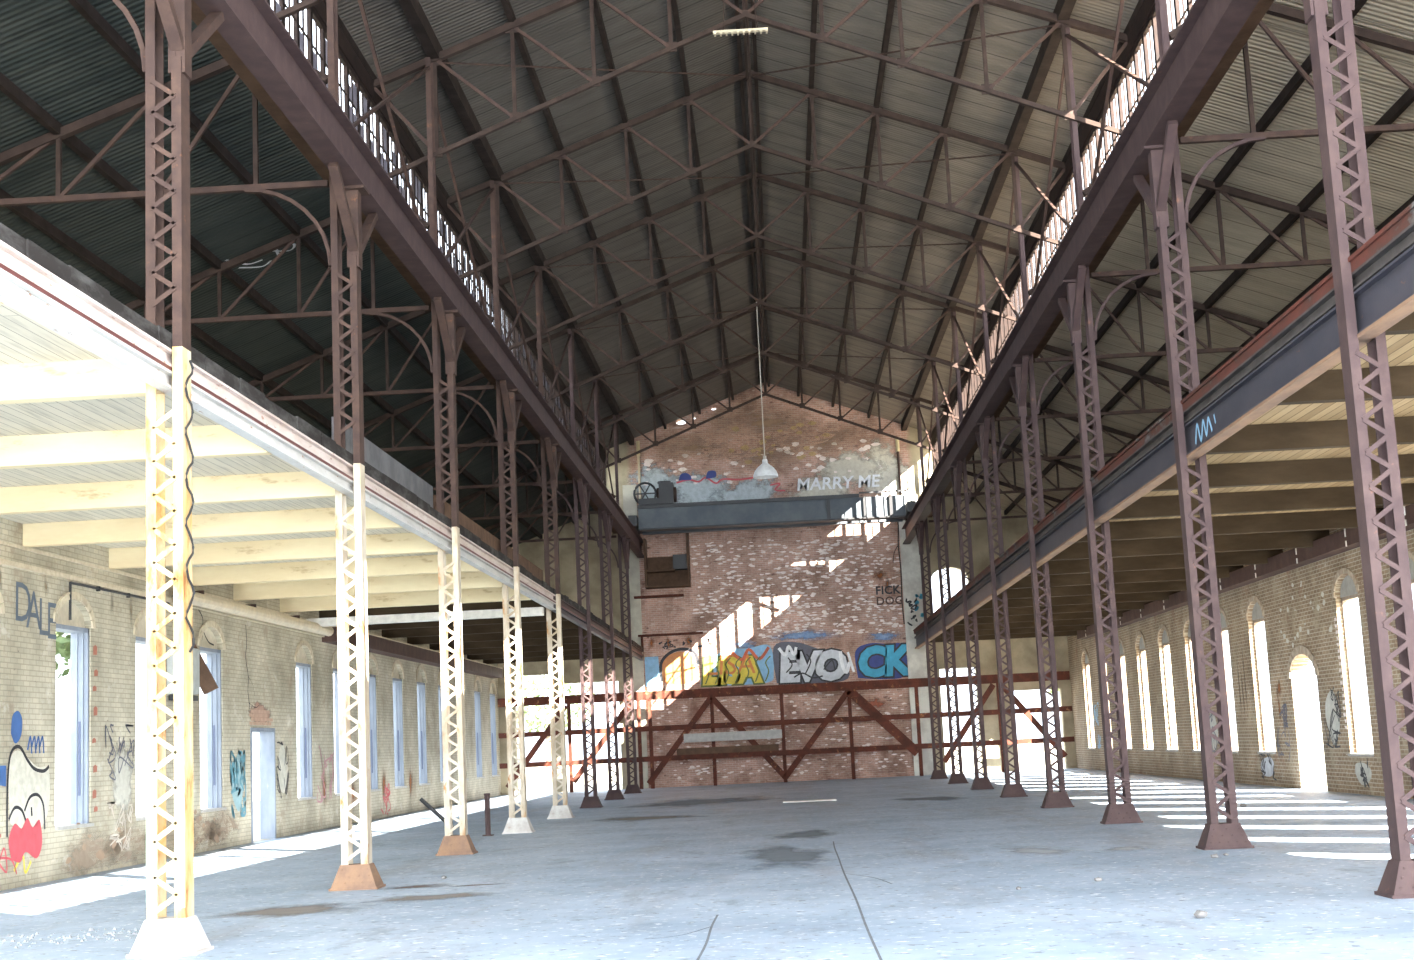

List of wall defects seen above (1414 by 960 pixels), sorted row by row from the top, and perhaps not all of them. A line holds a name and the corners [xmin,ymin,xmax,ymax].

corrosion [1351,209,1414,272]
corrosion [914,277,1334,633]
peeling [66,823,146,873]
peeling [194,809,238,849]
crack [833,841,892,960]